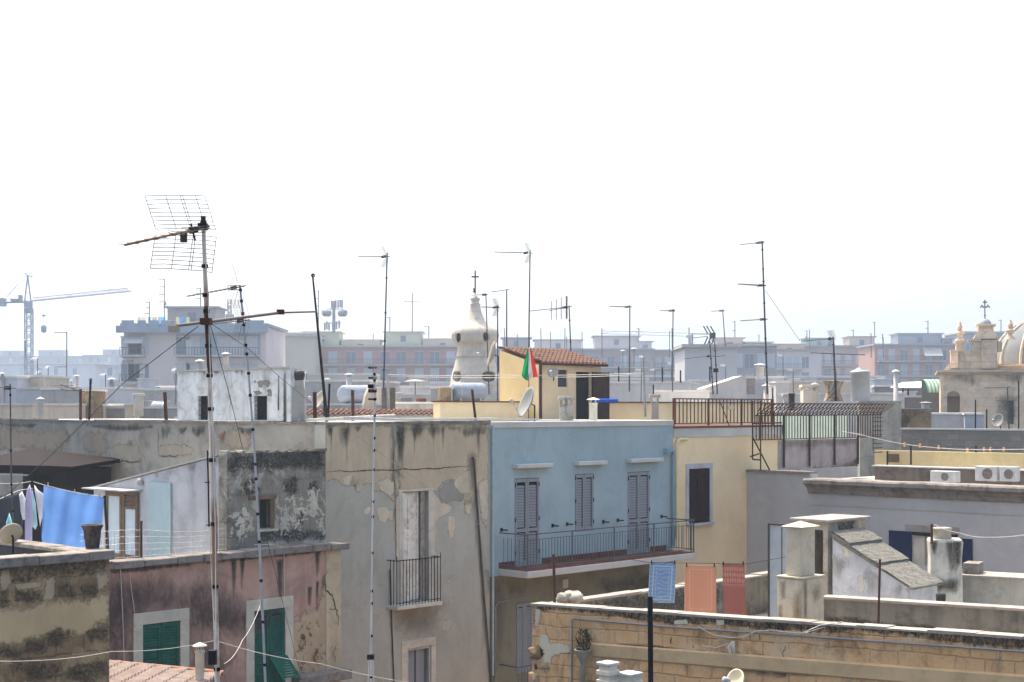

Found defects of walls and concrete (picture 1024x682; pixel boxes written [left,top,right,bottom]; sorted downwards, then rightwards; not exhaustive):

flaking render [227,470,255,548]
mould [227,451,323,495]
flaking render [271,424,489,560]
leakage [397,425,444,452]
leakage [261,511,324,593]
leakage [0,561,262,682]
crack [322,571,339,657]
flaking render [535,609,571,672]